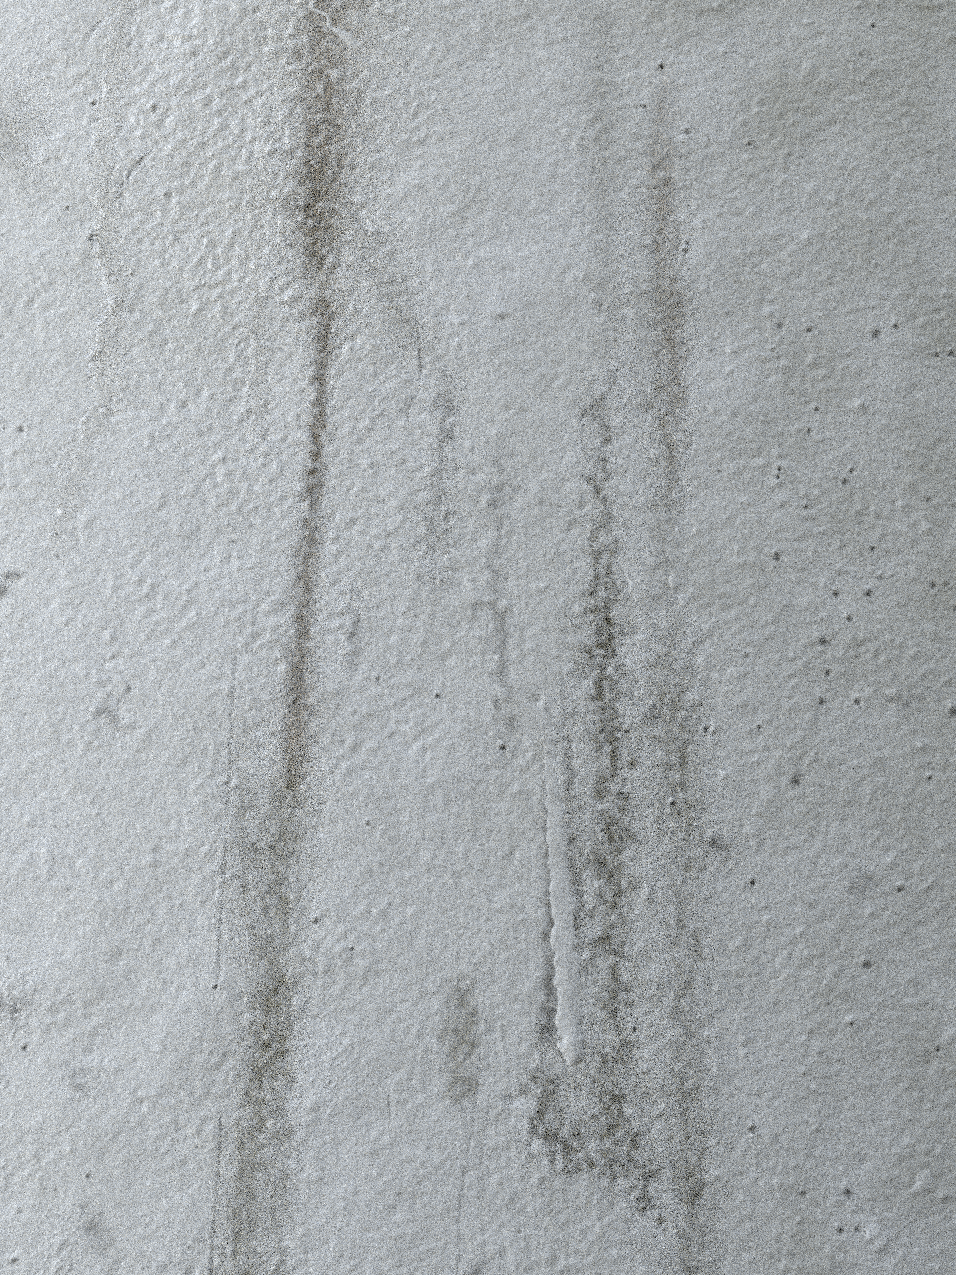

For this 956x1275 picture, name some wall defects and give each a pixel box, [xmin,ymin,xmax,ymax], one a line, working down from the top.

leakage [593,678,616,761]
leakage [545,967,553,1031]
leakage [531,1076,576,1154]